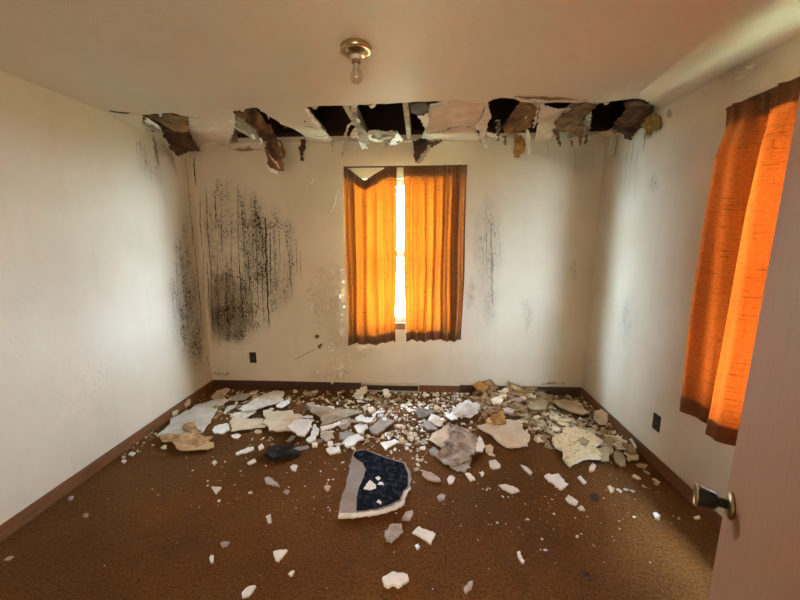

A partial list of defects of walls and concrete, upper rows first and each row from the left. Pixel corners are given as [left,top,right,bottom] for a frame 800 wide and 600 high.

mould [170,161,301,376]